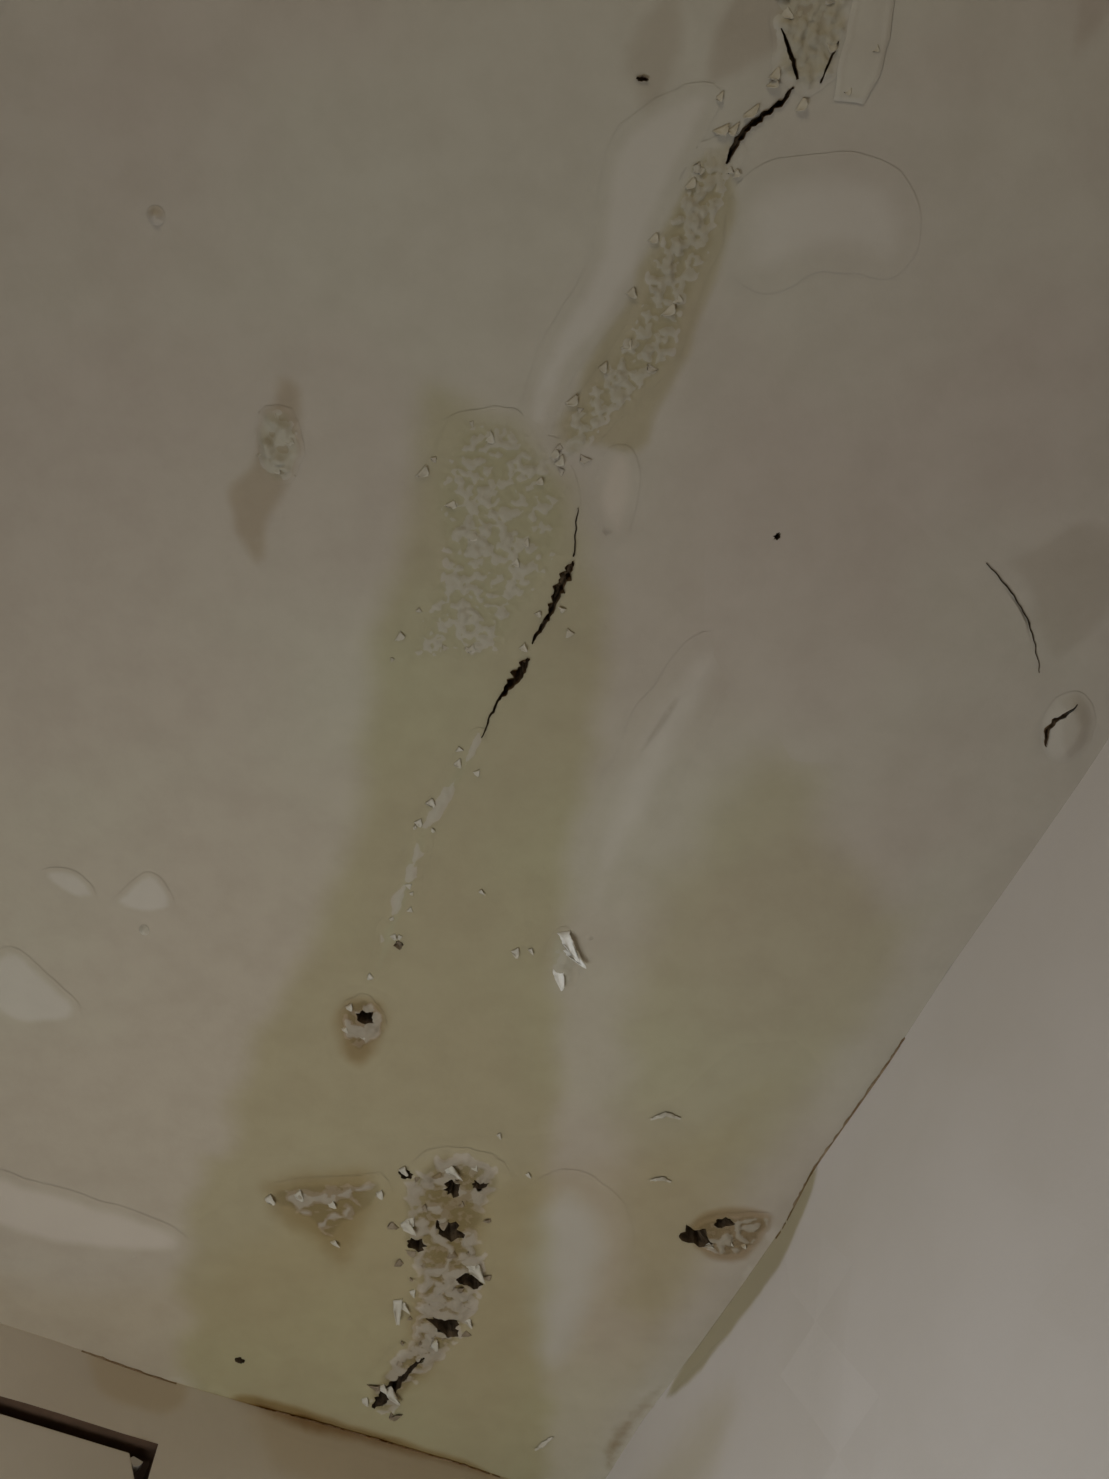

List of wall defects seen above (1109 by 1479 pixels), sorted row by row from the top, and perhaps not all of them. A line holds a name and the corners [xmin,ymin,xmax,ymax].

crack [726,28,839,164]
peeling [768,0,894,112]
peeling [548,124,747,476]
crack [481,512,578,738]
spalling [262,1133,531,1421]
spalling [679,1212,776,1259]